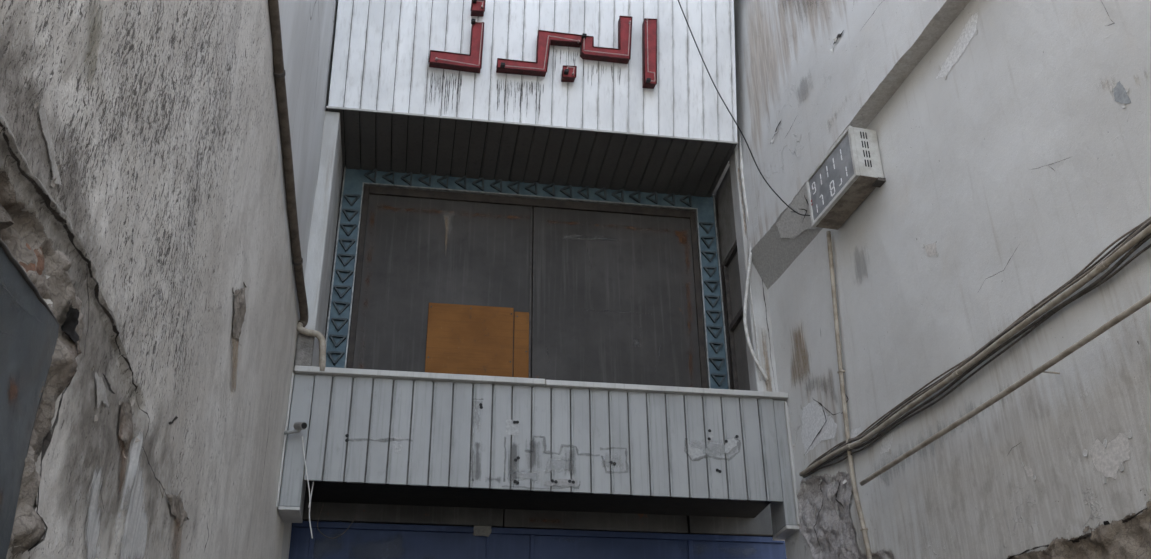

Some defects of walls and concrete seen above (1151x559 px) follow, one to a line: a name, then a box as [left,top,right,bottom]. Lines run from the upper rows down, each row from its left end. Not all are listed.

leakage [429,71,462,113]
leakage [497,79,544,119]
peeling [33,102,62,188]
spalling [0,171,85,559]
spalling [232,281,247,390]
spalling [92,366,141,459]
peeling [800,400,864,460]
peeling [1083,429,1132,484]
spalling [162,489,189,531]
spalling [797,471,894,559]
spalling [1008,501,1151,559]